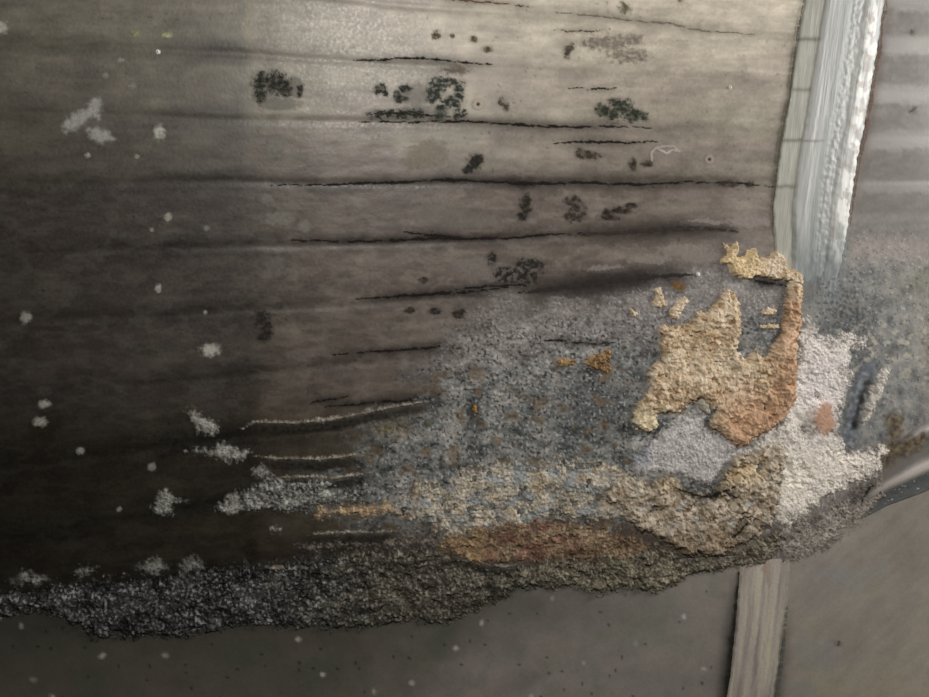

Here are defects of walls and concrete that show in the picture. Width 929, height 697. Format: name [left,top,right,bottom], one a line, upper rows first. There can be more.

leakage [62,98,114,142]
leakage [366,83,424,119]
leakage [426,65,466,120]
crack [271,0,804,226]
crack [292,231,582,243]
crack [356,283,527,300]
crack [540,338,615,346]
peeling [242,400,426,432]
leakage [184,411,249,464]
rust [0,228,929,642]
peeling [255,453,376,489]
peeling [313,529,397,543]